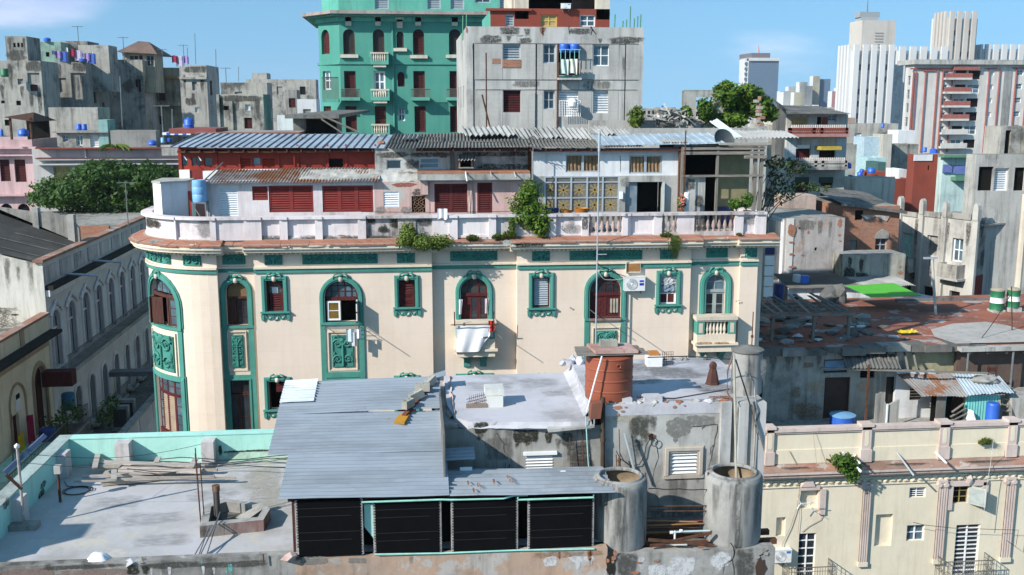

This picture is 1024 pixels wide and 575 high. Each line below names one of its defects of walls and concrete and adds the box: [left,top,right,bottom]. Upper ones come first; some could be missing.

peeling [607,396,730,442]
leakage [474,422,593,467]
spalling [569,550,618,575]